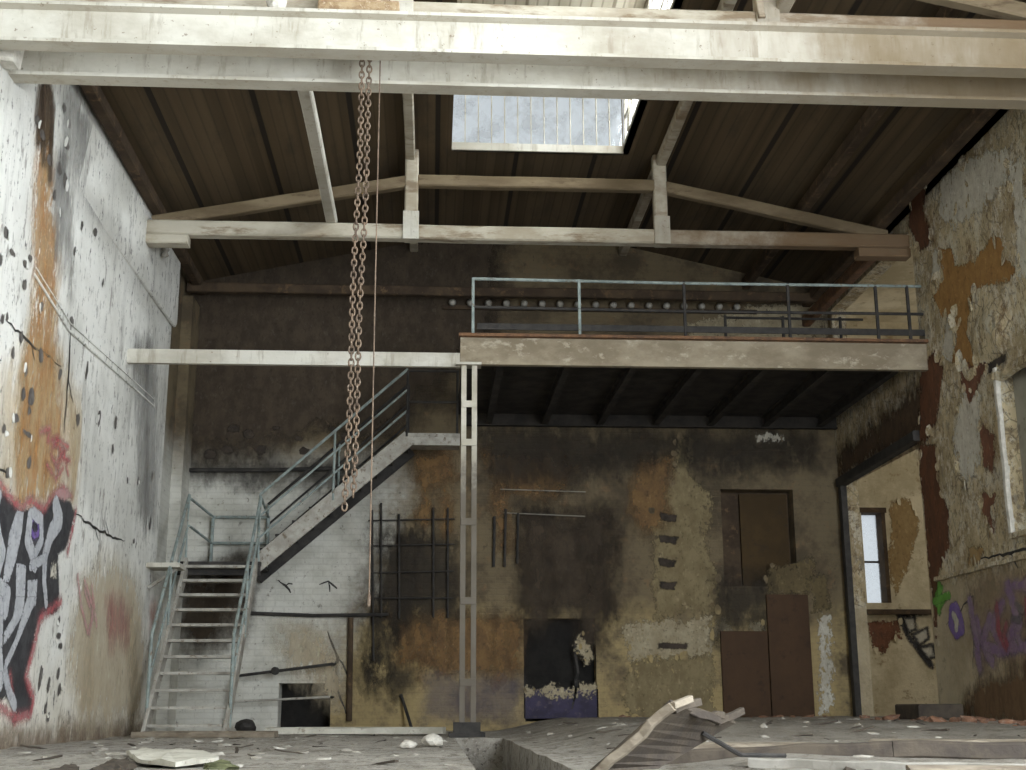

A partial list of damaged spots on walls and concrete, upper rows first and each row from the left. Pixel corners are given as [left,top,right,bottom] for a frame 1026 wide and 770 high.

corrosion [16,84,61,509]
peeling [888,185,1015,647]
crack [76,514,123,541]
spalling [659,535,679,545]
spalling [658,558,676,567]
spalling [660,581,677,590]
peeling [868,617,903,655]
spalling [649,642,687,663]